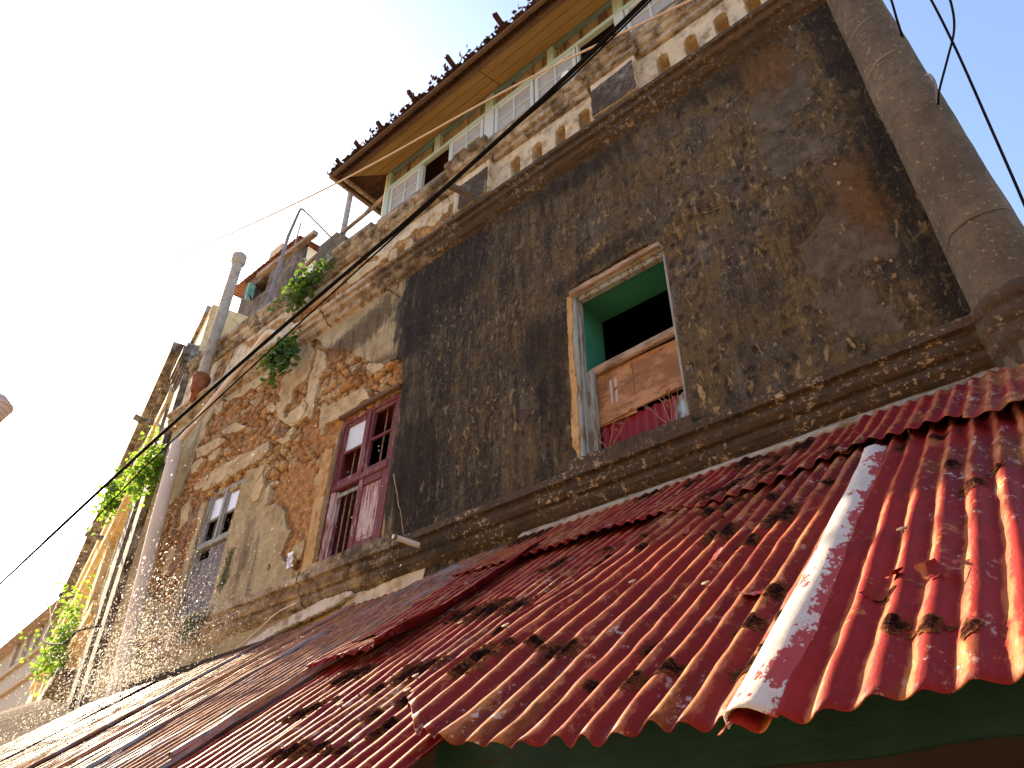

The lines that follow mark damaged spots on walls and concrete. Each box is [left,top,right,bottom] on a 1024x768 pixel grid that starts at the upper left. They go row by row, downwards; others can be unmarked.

spalling [149,340,403,605]
rust [633,436,837,552]
rust [943,457,961,469]
rust [953,476,989,497]
rust [504,523,560,549]
rust [533,554,574,574]
rust [590,521,659,571]
rust [728,581,790,682]
rust [880,585,985,641]
rust [264,581,584,766]
rust [580,678,600,693]
rust [616,637,688,690]